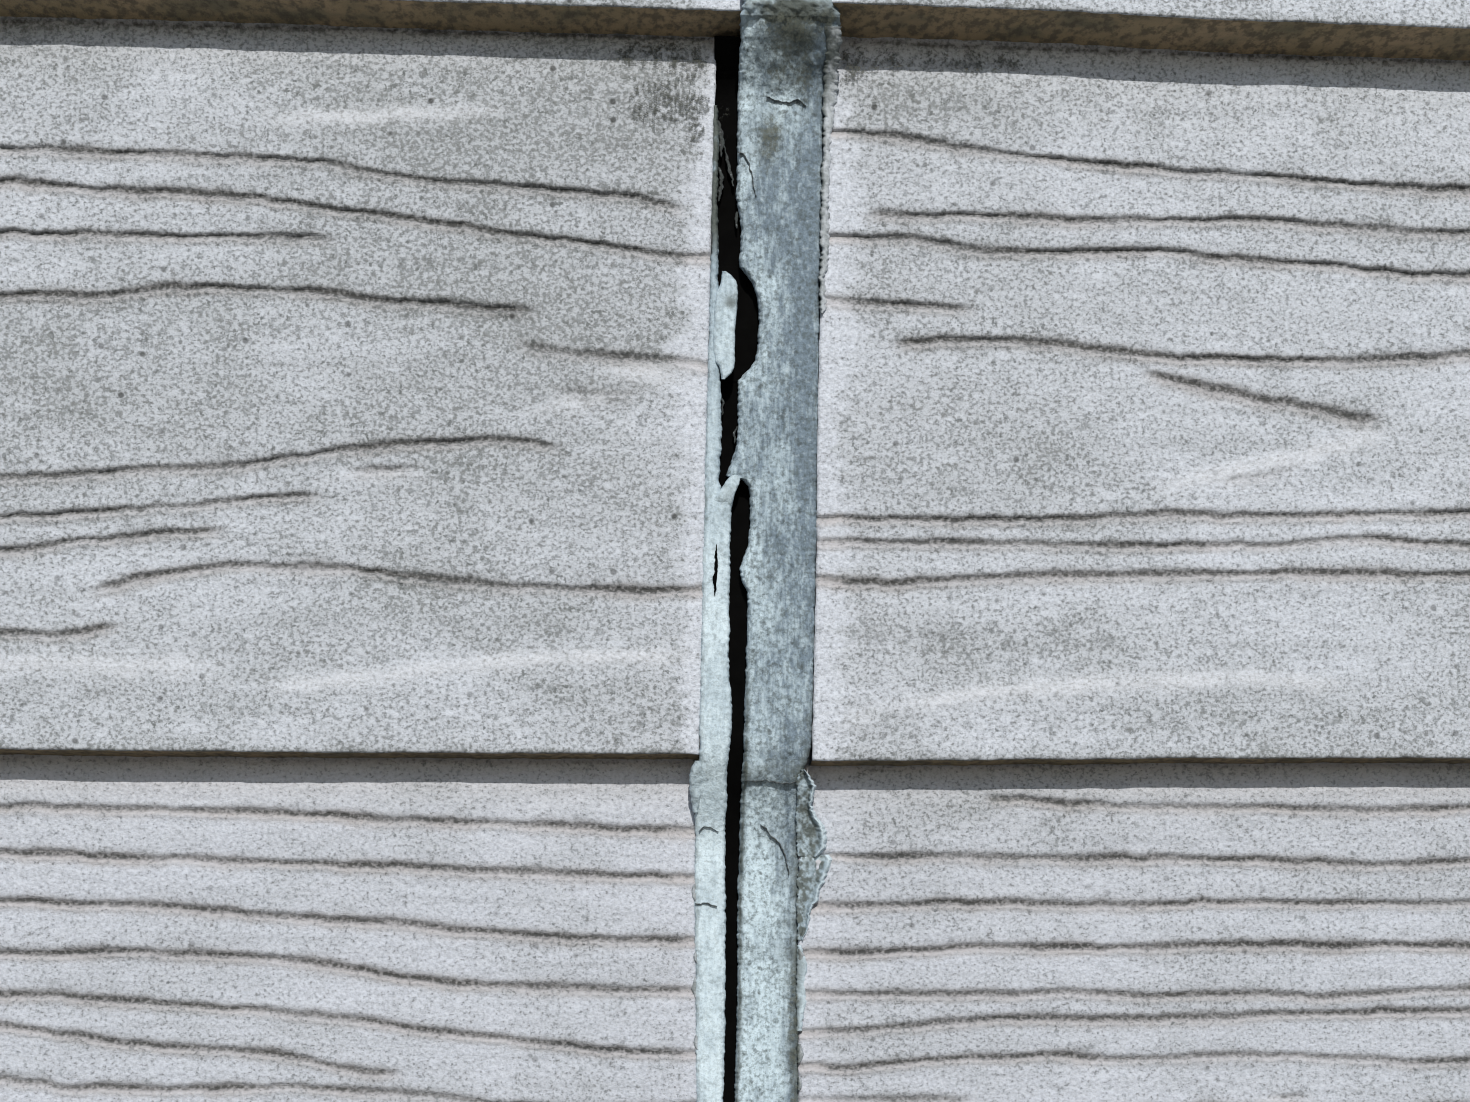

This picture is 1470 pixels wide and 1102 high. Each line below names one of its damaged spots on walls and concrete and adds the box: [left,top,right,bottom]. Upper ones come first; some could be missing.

peeling [713,271,738,379]
peeling [714,475,740,508]
crack [695,36,806,1102]
peeling [795,769,832,1090]